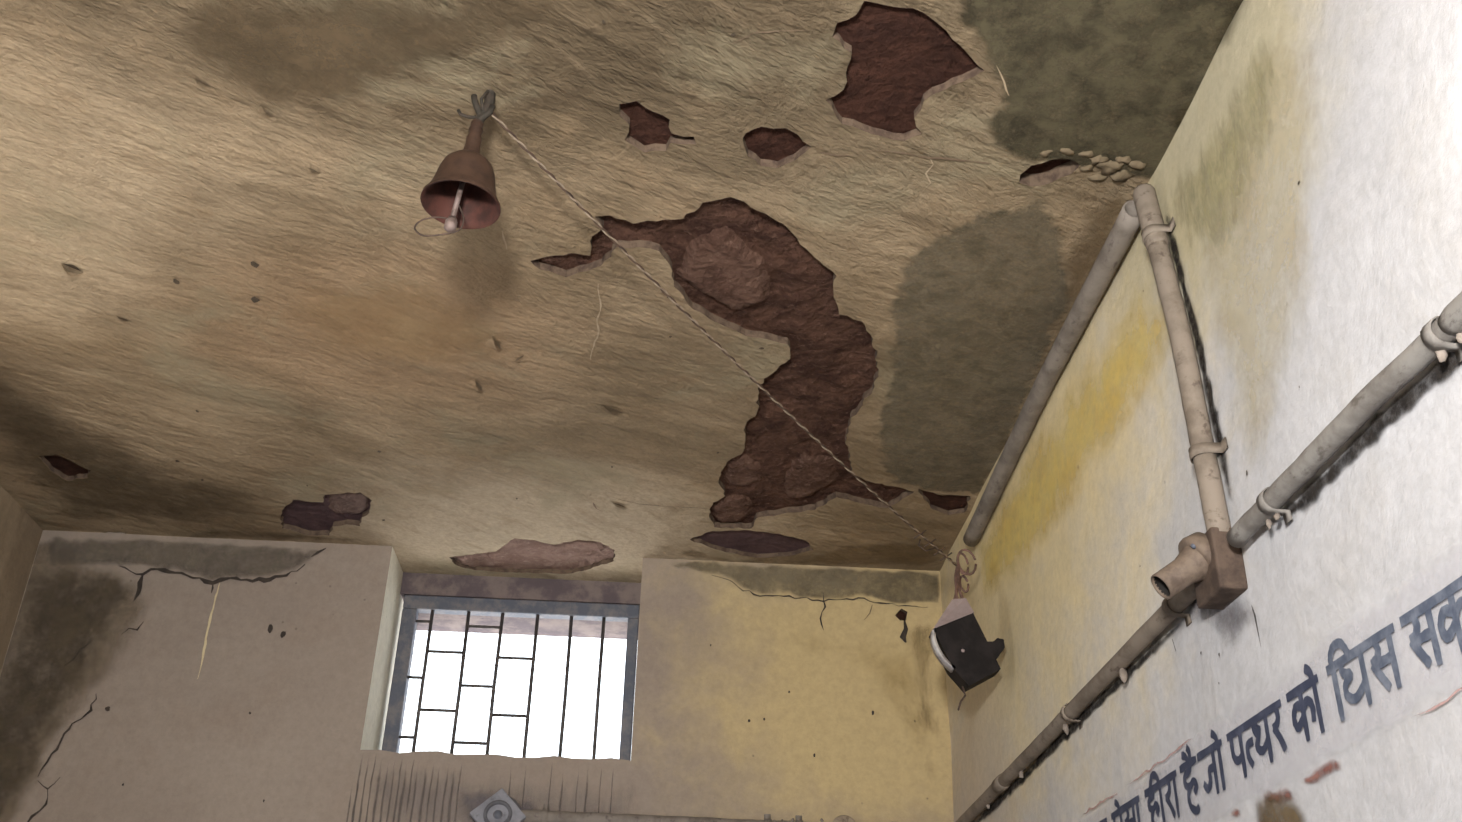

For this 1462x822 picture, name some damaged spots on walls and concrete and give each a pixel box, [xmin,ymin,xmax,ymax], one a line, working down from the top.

spalling [619,101,696,153]
spalling [743,127,811,168]
crack [816,150,991,193]
spalling [826,1,984,141]
water stain [962,0,1243,177]
crack [590,290,602,359]
water stain [880,202,1102,494]
spalling [531,197,971,643]
crack [63,548,326,667]
water stain [0,535,320,822]
crack [27,697,97,822]
corrosion [1258,798,1302,822]